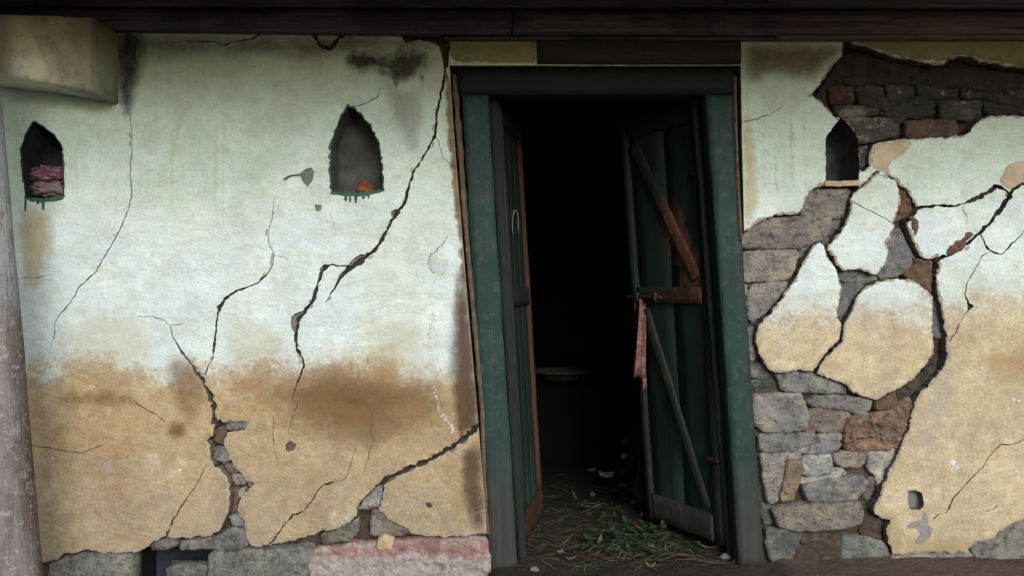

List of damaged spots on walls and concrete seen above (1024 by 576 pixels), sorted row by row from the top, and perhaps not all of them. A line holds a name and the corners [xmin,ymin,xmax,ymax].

water stain [348,53,426,82]
crack [50,112,132,350]
crack [138,198,287,425]
spalling [283,167,314,187]
crack [273,70,458,459]
spalling [742,45,1024,563]
crack [852,182,1024,342]
crack [165,465,207,537]
spalling [42,421,418,576]
crack [268,405,479,544]
water stain [463,450,482,523]
crack [933,439,1024,519]